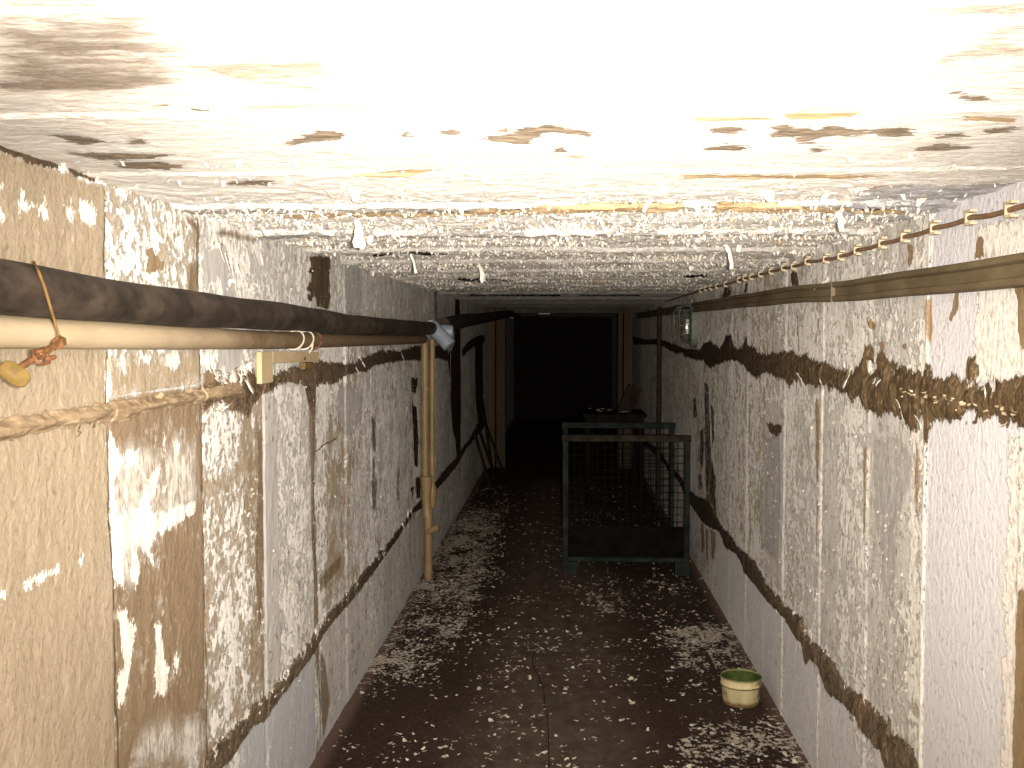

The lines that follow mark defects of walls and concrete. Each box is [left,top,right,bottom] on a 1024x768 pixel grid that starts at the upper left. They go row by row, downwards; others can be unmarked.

water stain [0,26,169,91]
peeling [692,107,974,159]
peeling [948,91,991,101]
peeling [964,116,1019,134]
peeling [104,354,129,403]
spalling [137,124,1024,768]
peeling [105,429,219,590]
crack [311,437,337,607]
peeling [116,606,137,710]